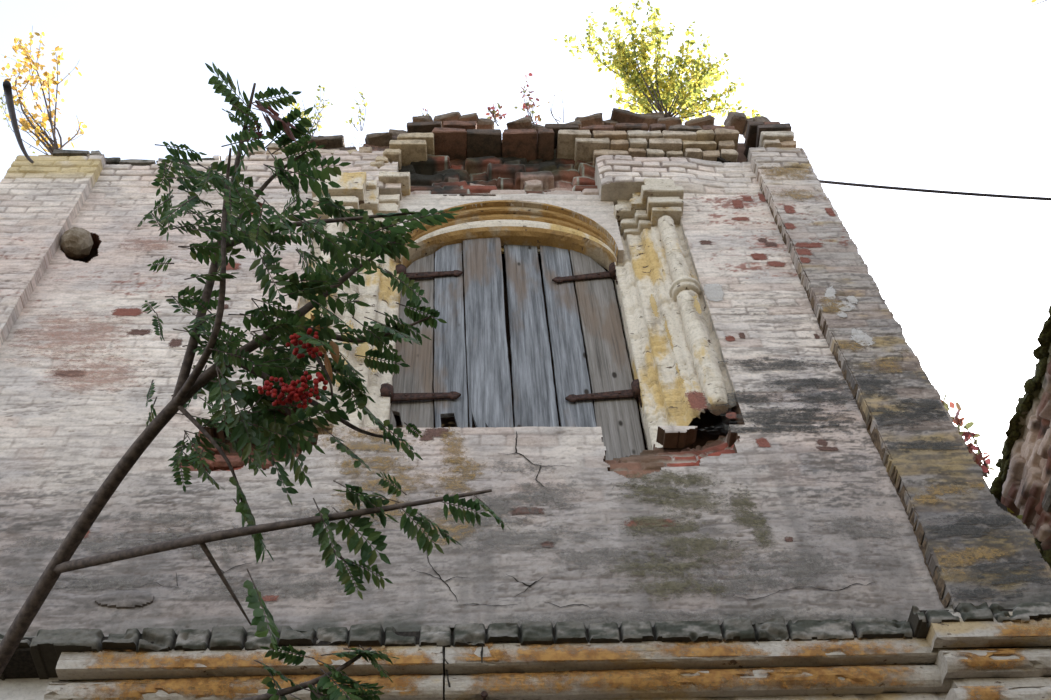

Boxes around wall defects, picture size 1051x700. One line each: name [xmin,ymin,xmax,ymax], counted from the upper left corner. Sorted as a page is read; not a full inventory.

spalling [398,148,599,196]
water stain [761,166,826,201]
spalling [178,417,334,471]
crack [498,431,568,502]
spalling [605,434,740,478]
water stain [78,426,847,624]
crack [414,537,589,608]